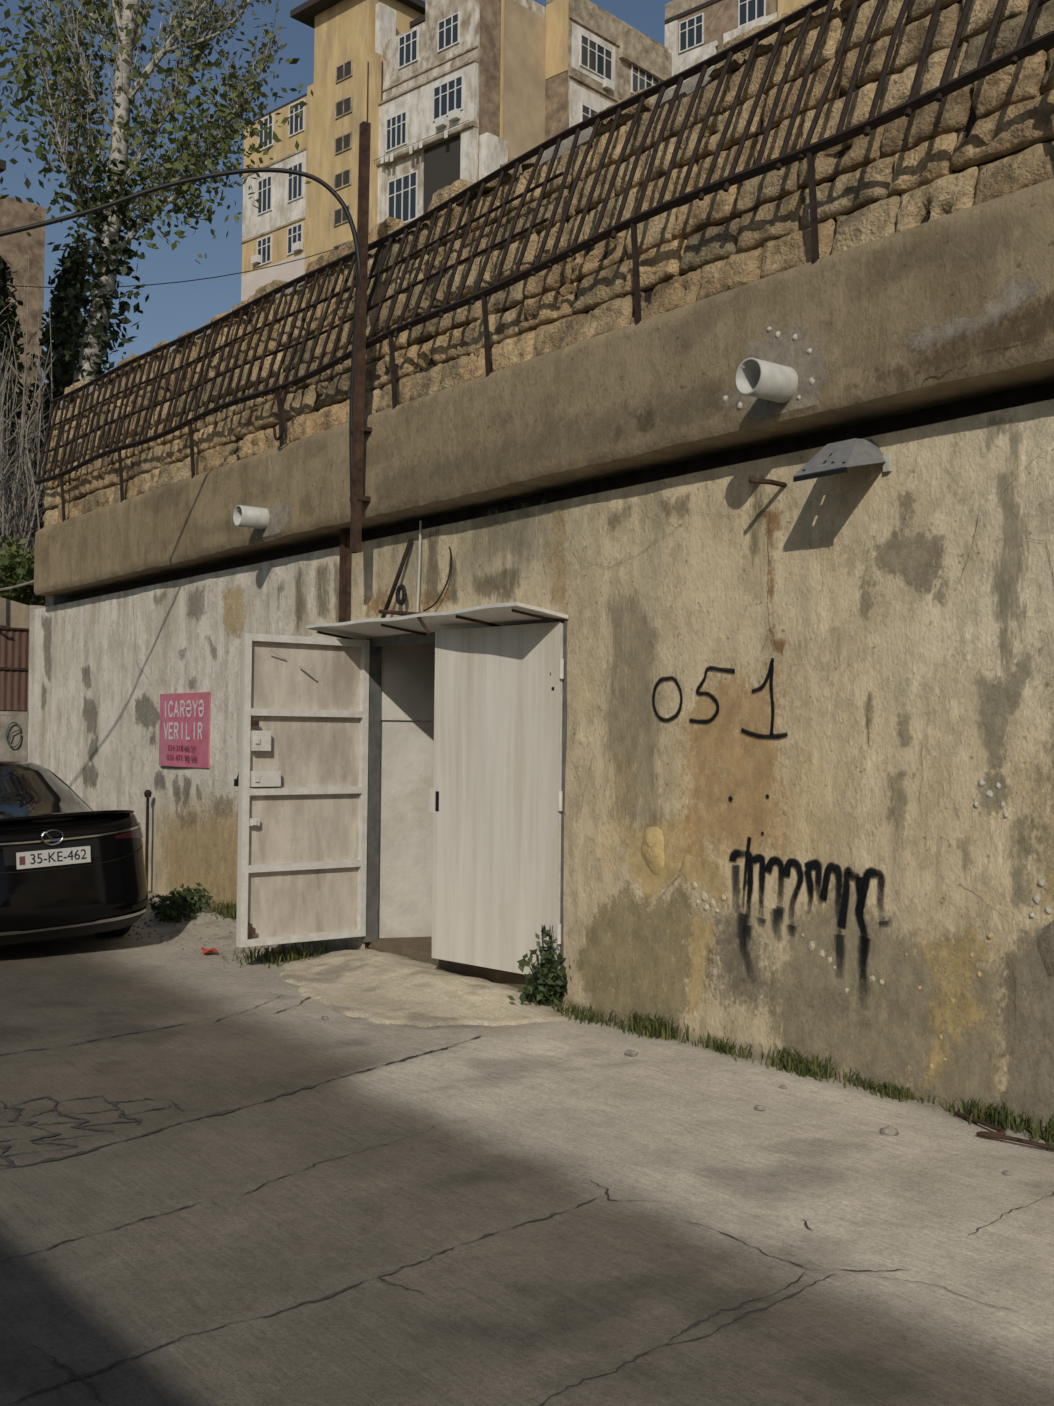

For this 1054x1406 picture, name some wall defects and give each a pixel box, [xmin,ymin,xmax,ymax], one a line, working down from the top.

crack [0,1036,481,1169]
crack [1,1124,438,1262]
crack [968,1192,1054,1236]
crack [5,1178,1016,1406]